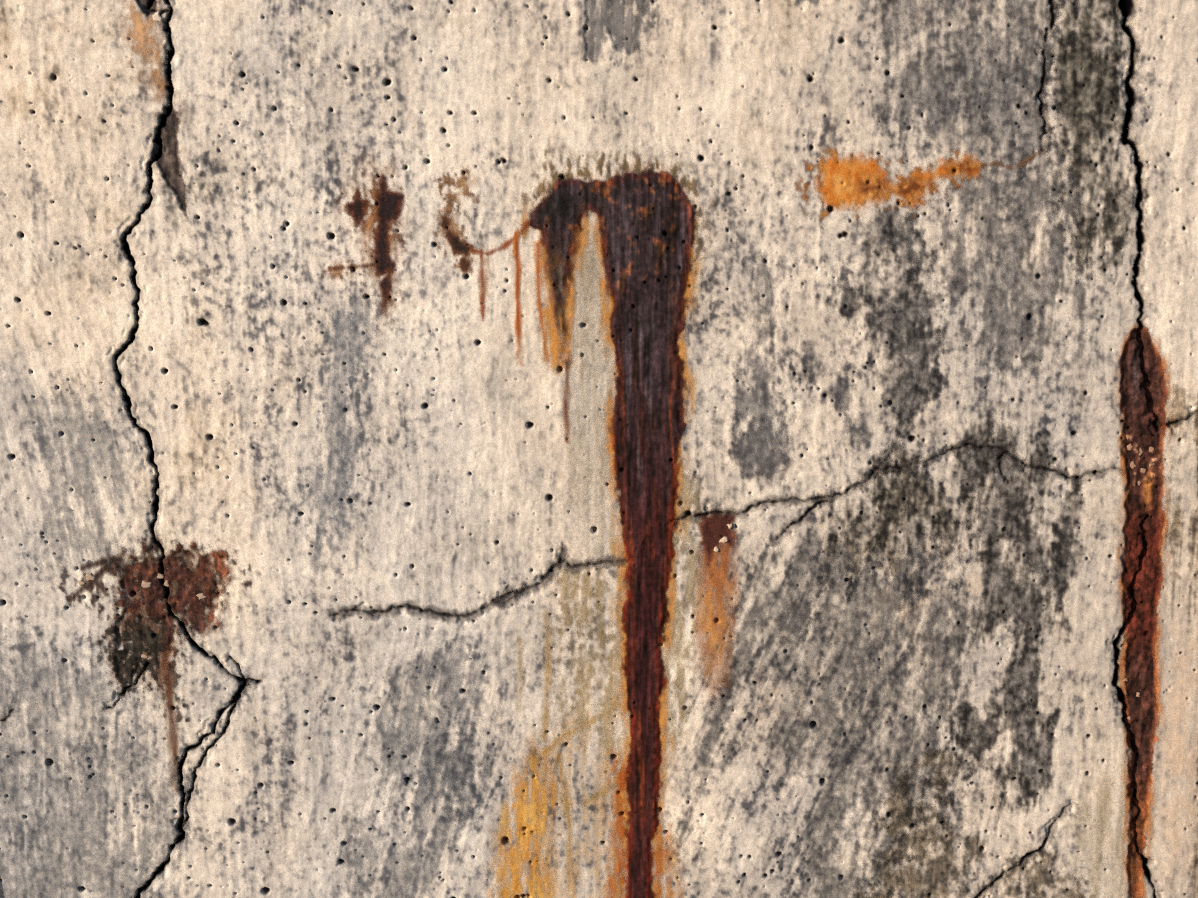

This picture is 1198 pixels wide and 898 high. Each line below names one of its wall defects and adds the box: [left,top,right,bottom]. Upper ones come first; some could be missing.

rust [328,174,405,311]
rust [801,149,1043,218]
crack [1118,0,1146,327]
rust [59,538,251,791]
crack [108,0,262,898]
crack [329,547,628,618]
rust [438,150,736,898]
crack [677,443,1120,540]
crack [1112,616,1130,731]
rust [1118,325,1170,898]
crack [975,807,1065,898]
crack [1141,853,1156,898]